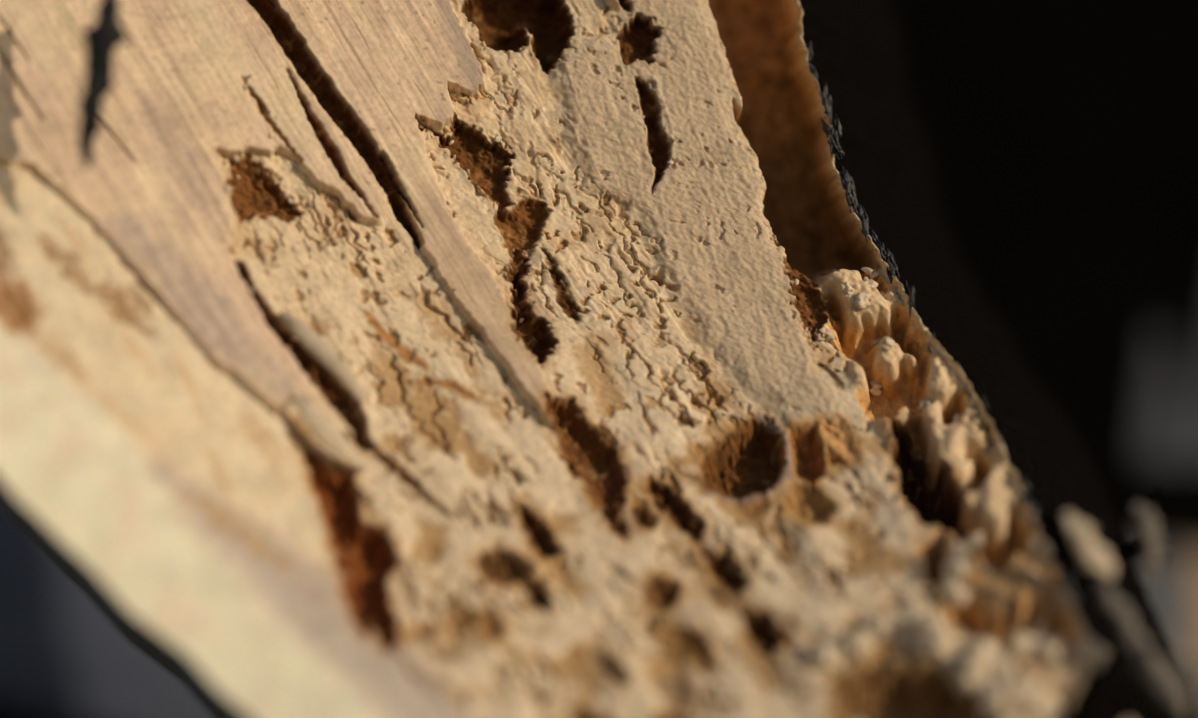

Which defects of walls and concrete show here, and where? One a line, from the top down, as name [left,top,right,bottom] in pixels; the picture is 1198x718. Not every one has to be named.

spalling [461,0,579,76]
spalling [617,0,668,68]
spalling [216,148,308,225]
crack [240,0,429,253]
spalling [415,113,514,191]
spalling [502,249,561,366]
spalling [774,236,833,347]
spalling [304,453,399,652]
spalling [475,503,562,611]
spalling [544,397,783,657]
spalling [889,412,965,542]
spalling [829,657,985,718]